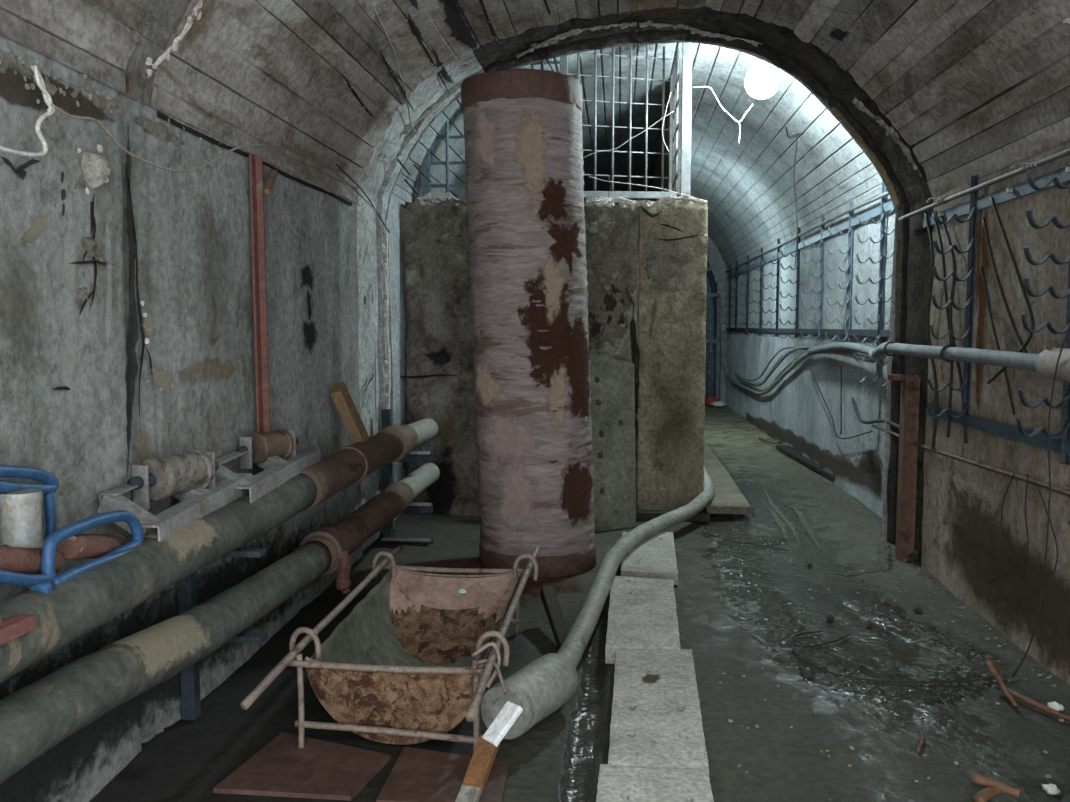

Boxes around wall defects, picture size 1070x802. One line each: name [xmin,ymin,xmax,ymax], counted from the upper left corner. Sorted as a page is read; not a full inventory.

spalling [0,49,124,121]
rust [518,177,590,426]